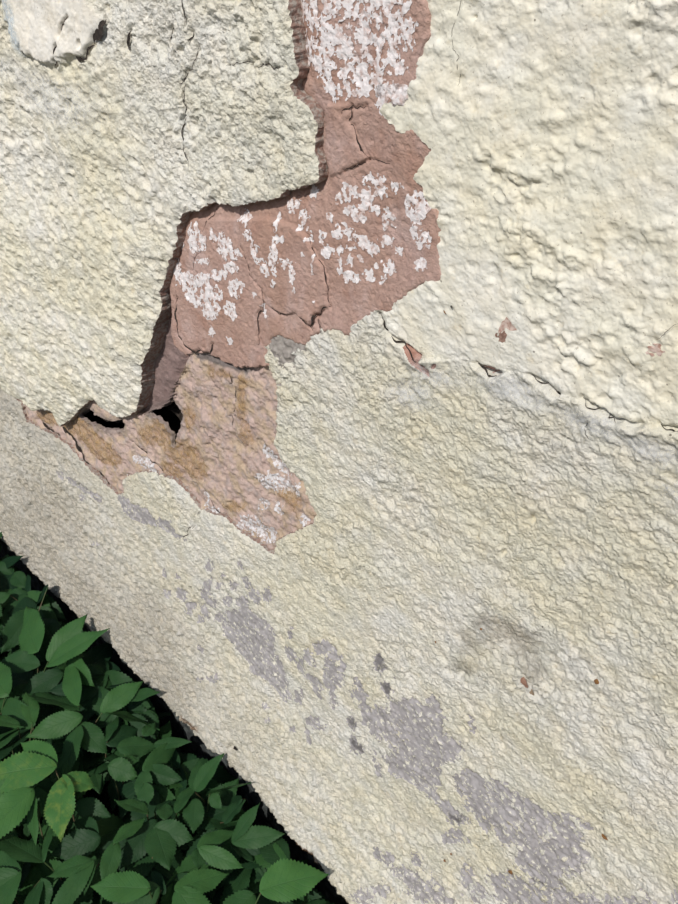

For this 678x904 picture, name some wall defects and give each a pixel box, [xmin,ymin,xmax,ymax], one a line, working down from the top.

crack [53,17,107,66]
crack [170,0,199,165]
flaking render [21,0,441,550]
crack [240,238,331,345]
crack [381,315,416,362]
flaking render [495,317,517,343]